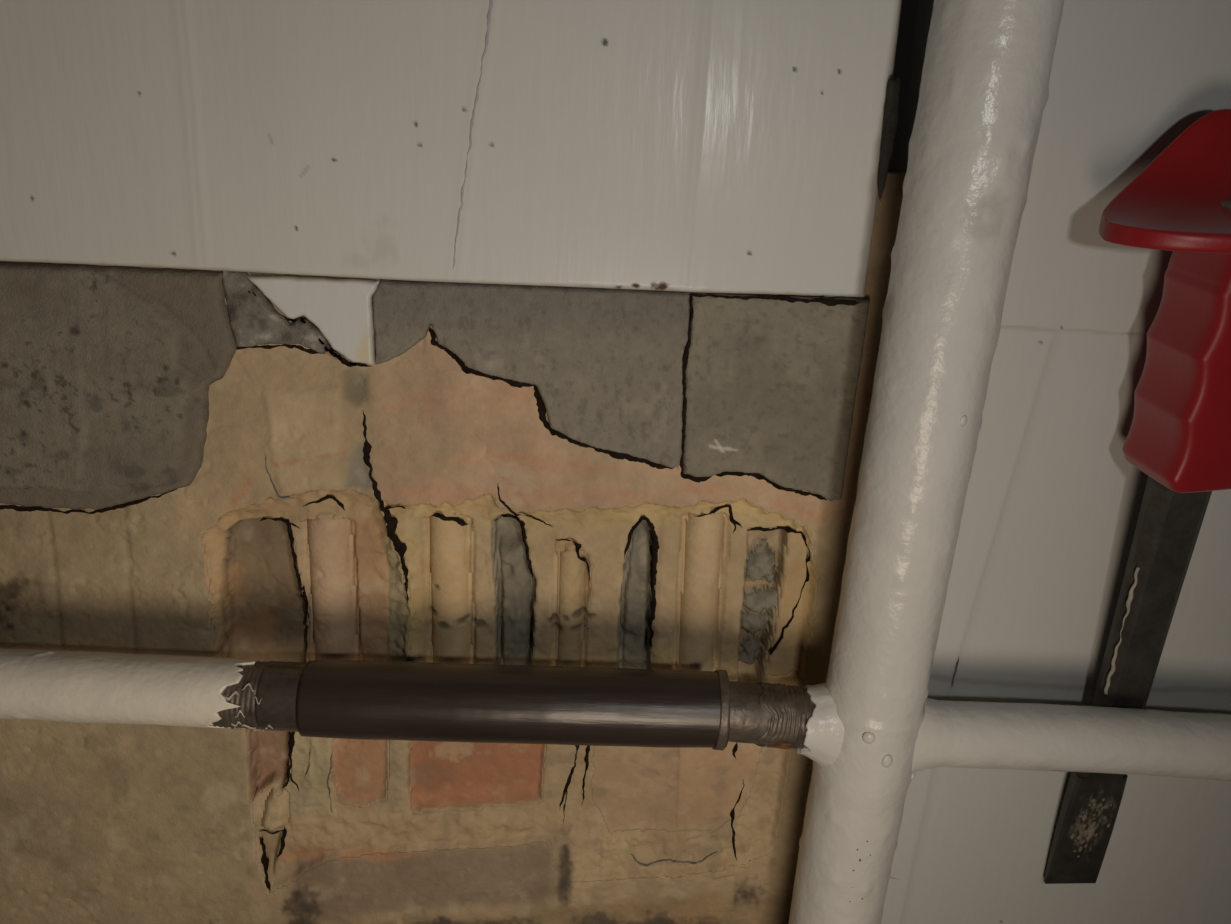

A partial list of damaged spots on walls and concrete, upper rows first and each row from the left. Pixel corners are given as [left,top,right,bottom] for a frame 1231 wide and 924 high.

crack [260,454,345,618]
crack [363,412,590,604]
spalling [201,489,820,680]
crack [259,827,287,891]
spalling [224,683,792,893]
crack [560,745,590,822]